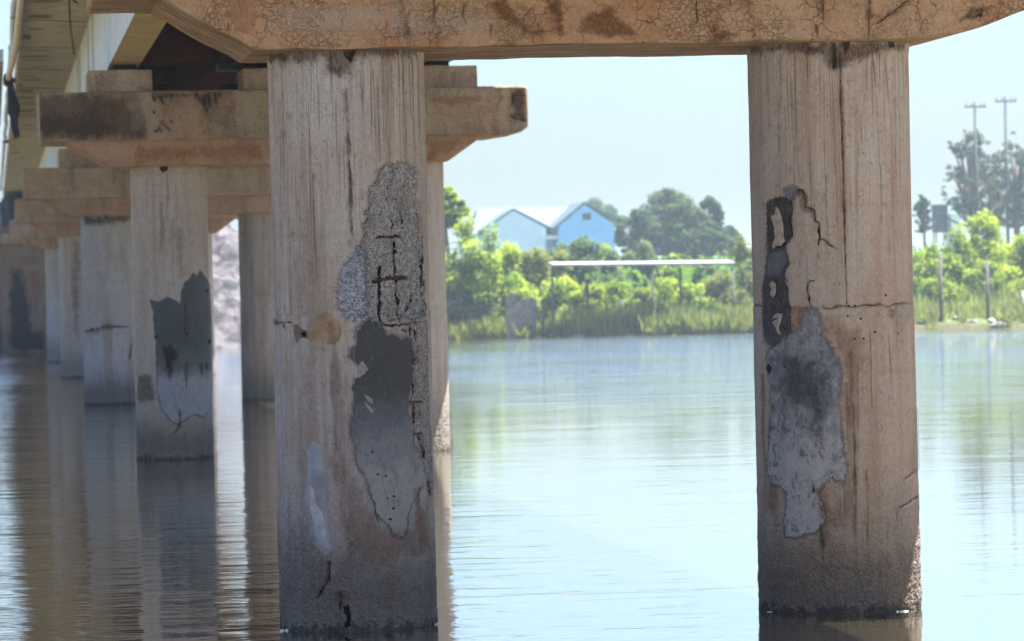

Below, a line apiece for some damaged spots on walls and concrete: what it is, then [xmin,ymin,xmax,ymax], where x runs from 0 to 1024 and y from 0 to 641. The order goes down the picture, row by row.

leakage [12,15,145,160]
spalling [293,162,434,496]
peeling [762,197,793,347]
crack [783,0,909,340]